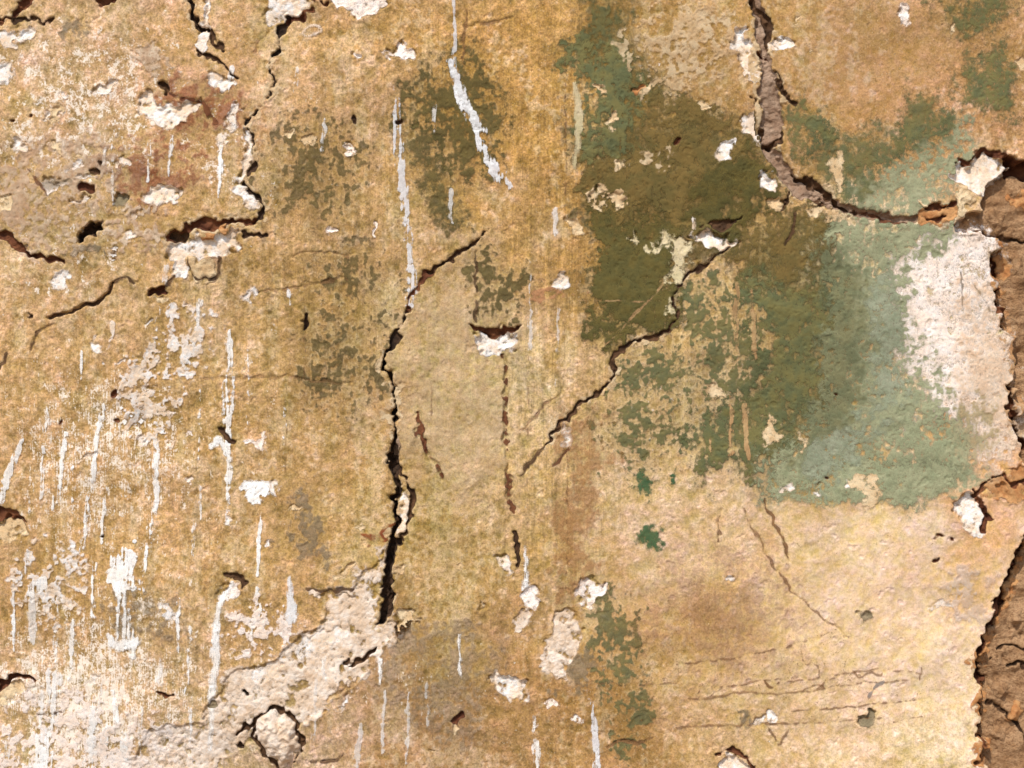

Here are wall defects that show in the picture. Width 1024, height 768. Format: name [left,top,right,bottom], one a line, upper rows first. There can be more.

flaking render [100,184,241,284]
crack [157,15,292,250]
leakage [393,99,417,307]
leakage [446,0,512,189]
leakage [572,82,583,169]
peeling [552,0,1024,538]
crack [747,0,918,246]
leakage [0,299,297,768]
crack [369,231,486,632]
crack [500,243,739,567]
flaking render [138,545,421,768]
peeling [539,577,656,768]